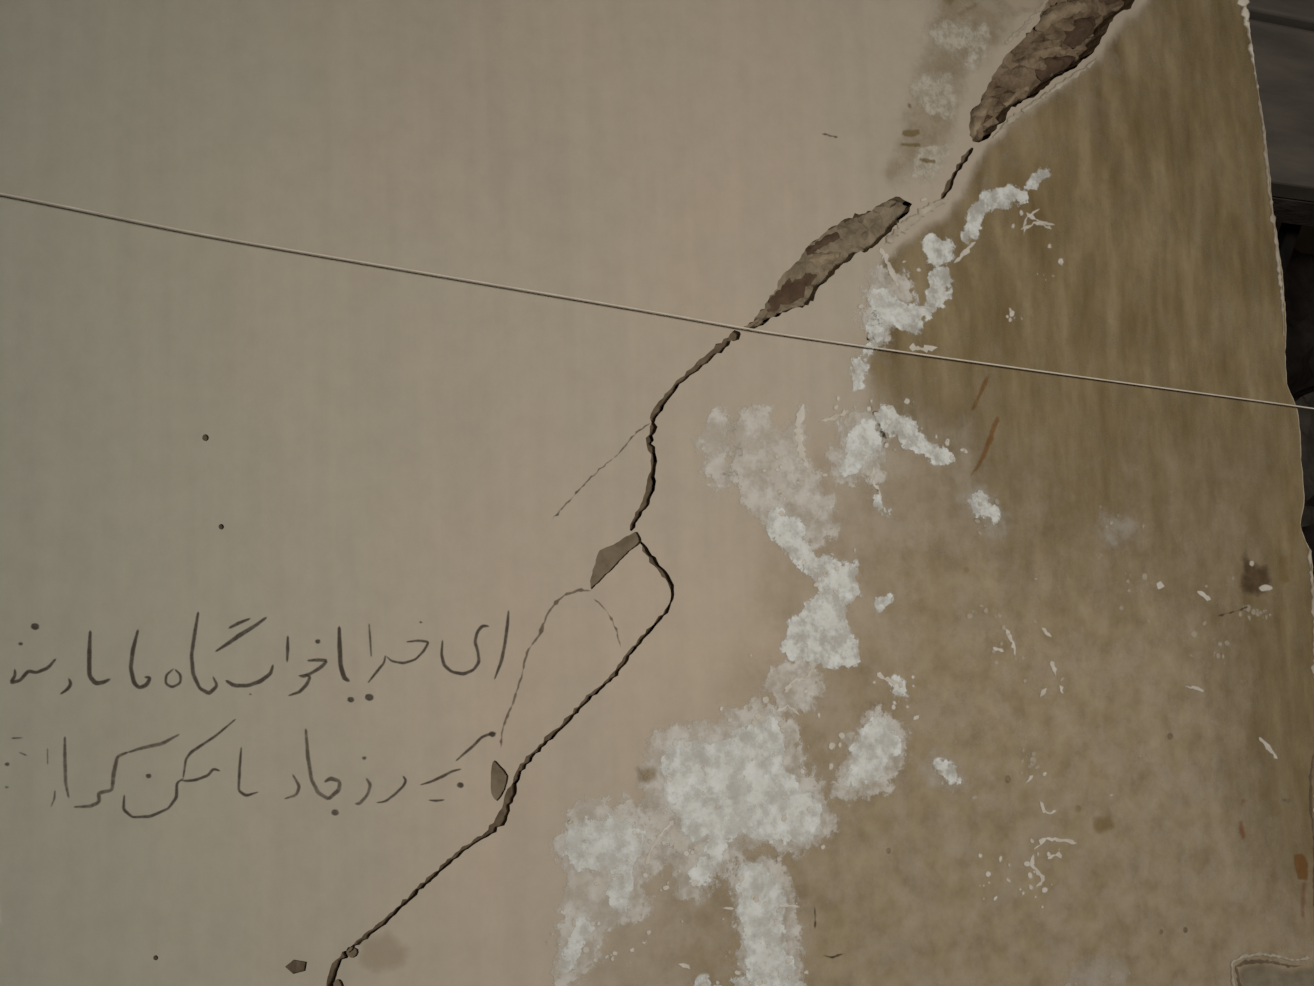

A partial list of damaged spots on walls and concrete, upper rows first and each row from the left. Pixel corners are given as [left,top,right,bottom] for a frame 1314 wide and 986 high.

crack [941,148,973,199]
spalling [910,0,1135,177]
spalling [1237,0,1284,334]
spalling [743,197,912,331]
damp [547,0,1314,986]
crack [326,330,741,986]
flaking render [1231,952,1314,986]